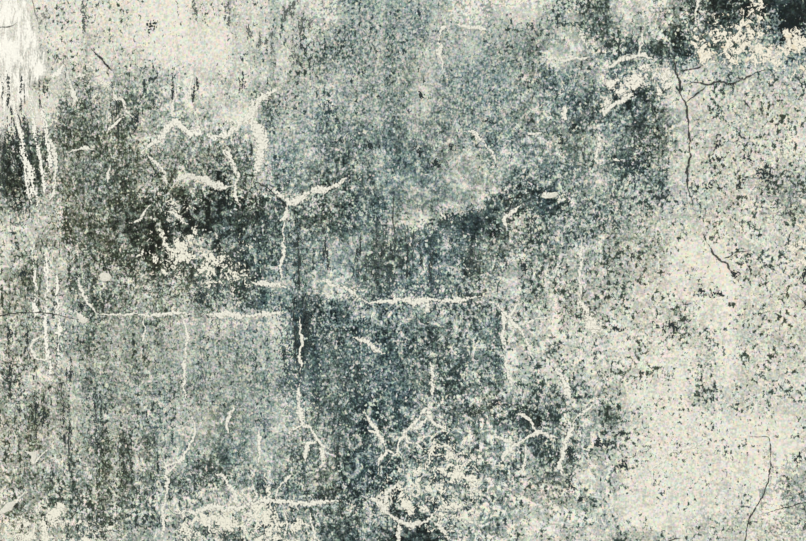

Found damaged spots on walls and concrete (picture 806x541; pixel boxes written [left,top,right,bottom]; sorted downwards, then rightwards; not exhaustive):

damp [281,0,299,22]
damp [706,0,806,48]
damp [0,62,93,227]
damp [107,83,134,146]
damp [141,70,283,205]
damp [272,178,347,221]
crack [673,44,769,211]
damp [740,137,806,223]
damp [0,326,29,439]
damp [489,301,550,390]
crack [744,436,806,541]
damp [758,447,806,541]